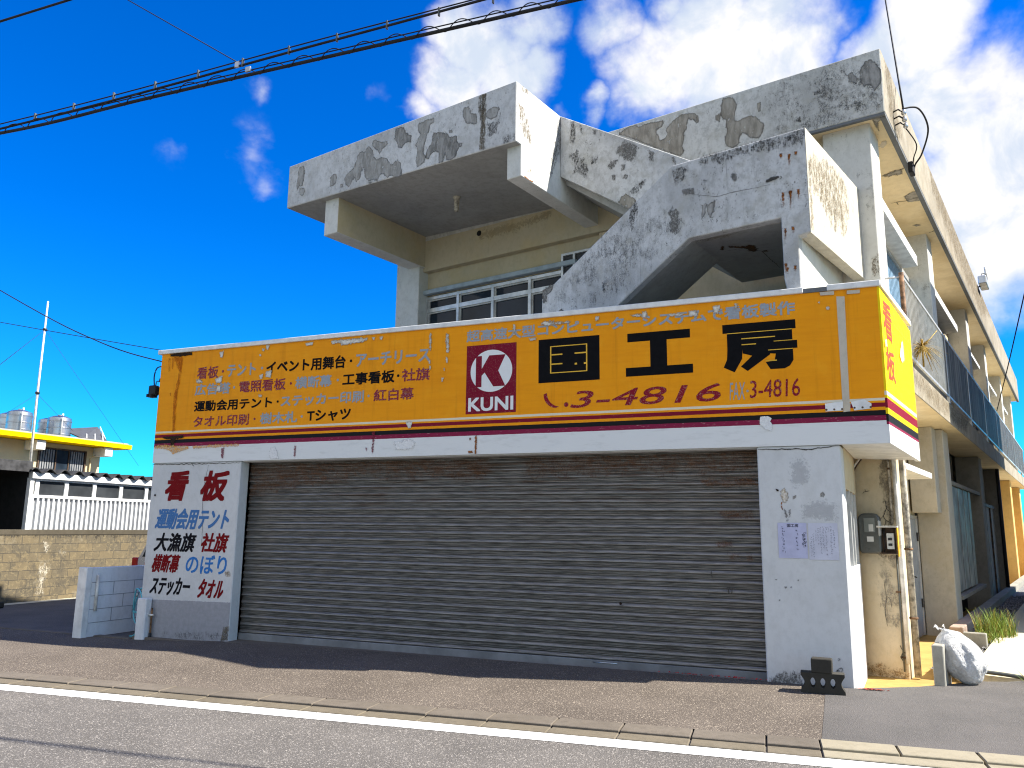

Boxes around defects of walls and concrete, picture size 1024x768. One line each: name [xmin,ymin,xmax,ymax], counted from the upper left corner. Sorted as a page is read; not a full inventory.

peeling [848,59,882,91]
peeling [330,118,462,187]
peeling [619,113,699,156]
leakage [672,157,705,195]
peeling [715,97,764,148]
leakage [701,64,901,235]